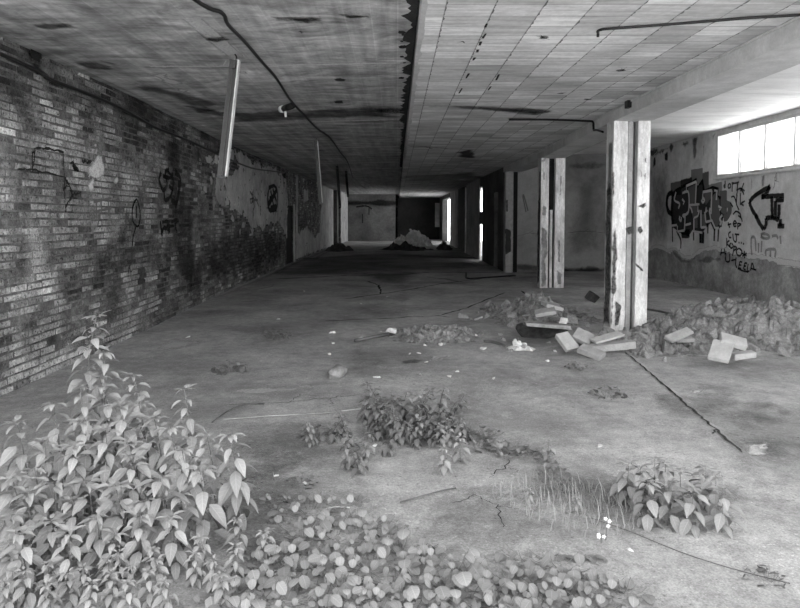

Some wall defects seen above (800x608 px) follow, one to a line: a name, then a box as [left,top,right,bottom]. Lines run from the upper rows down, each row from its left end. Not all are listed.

spalling [398,0,428,167]
peeling [203,149,348,259]
crack [458,495,511,527]